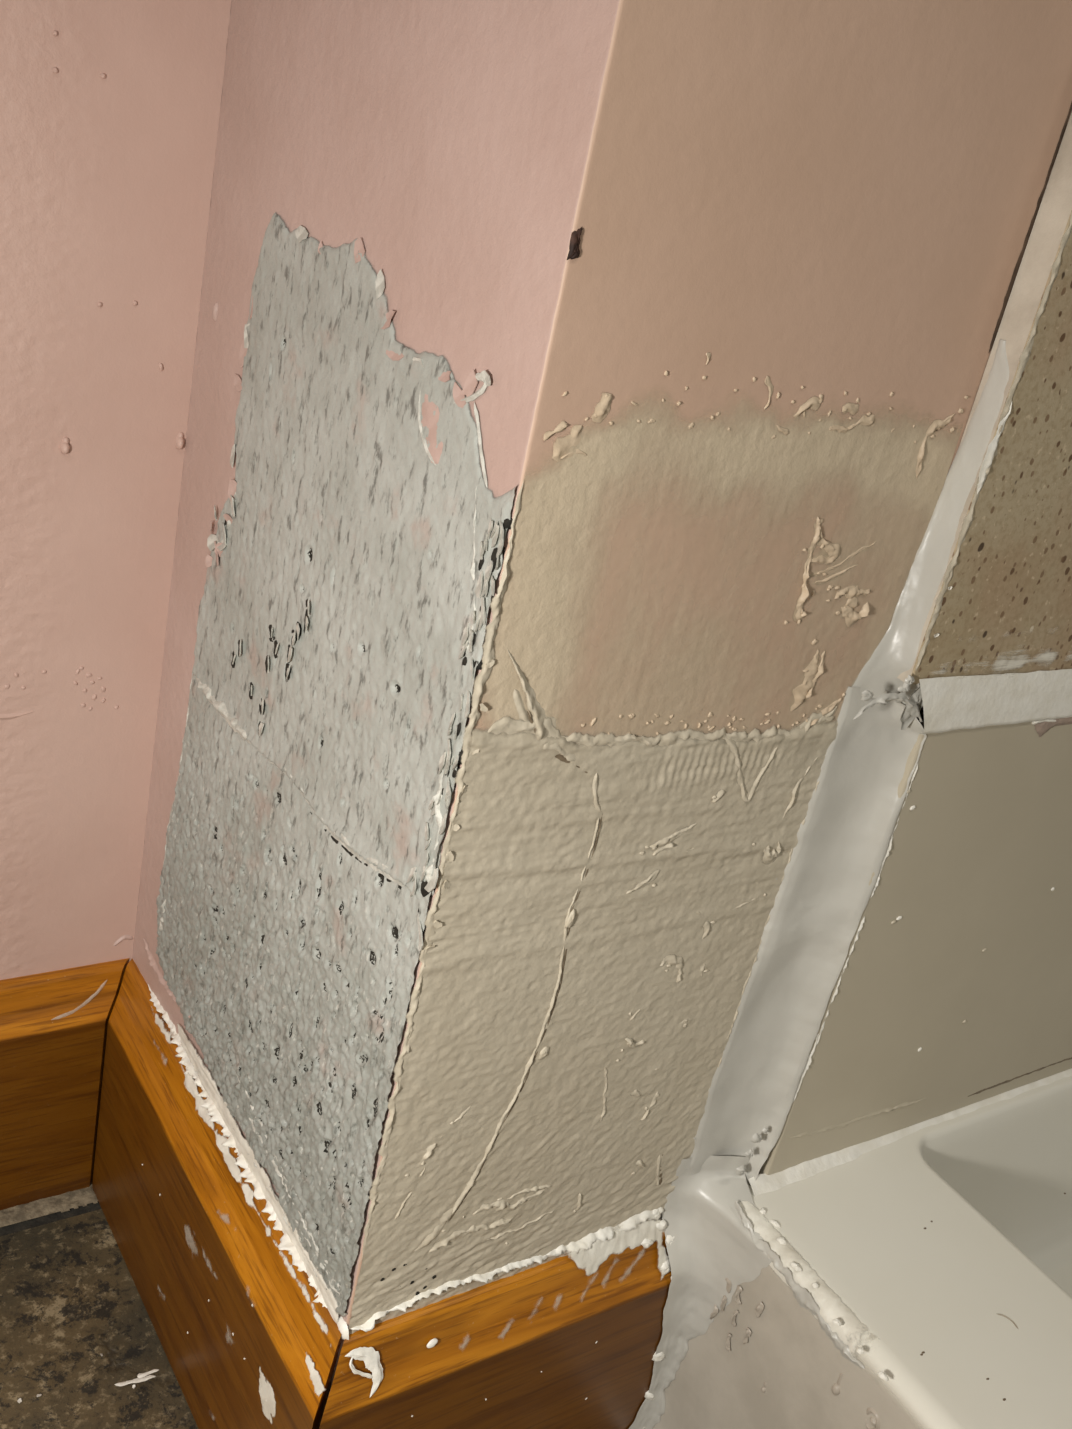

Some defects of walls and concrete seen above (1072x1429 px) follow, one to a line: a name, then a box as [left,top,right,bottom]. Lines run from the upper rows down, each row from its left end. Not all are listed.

crack [196,678,405,890]
peeling [156,212,523,1317]
crack [414,814,603,1252]